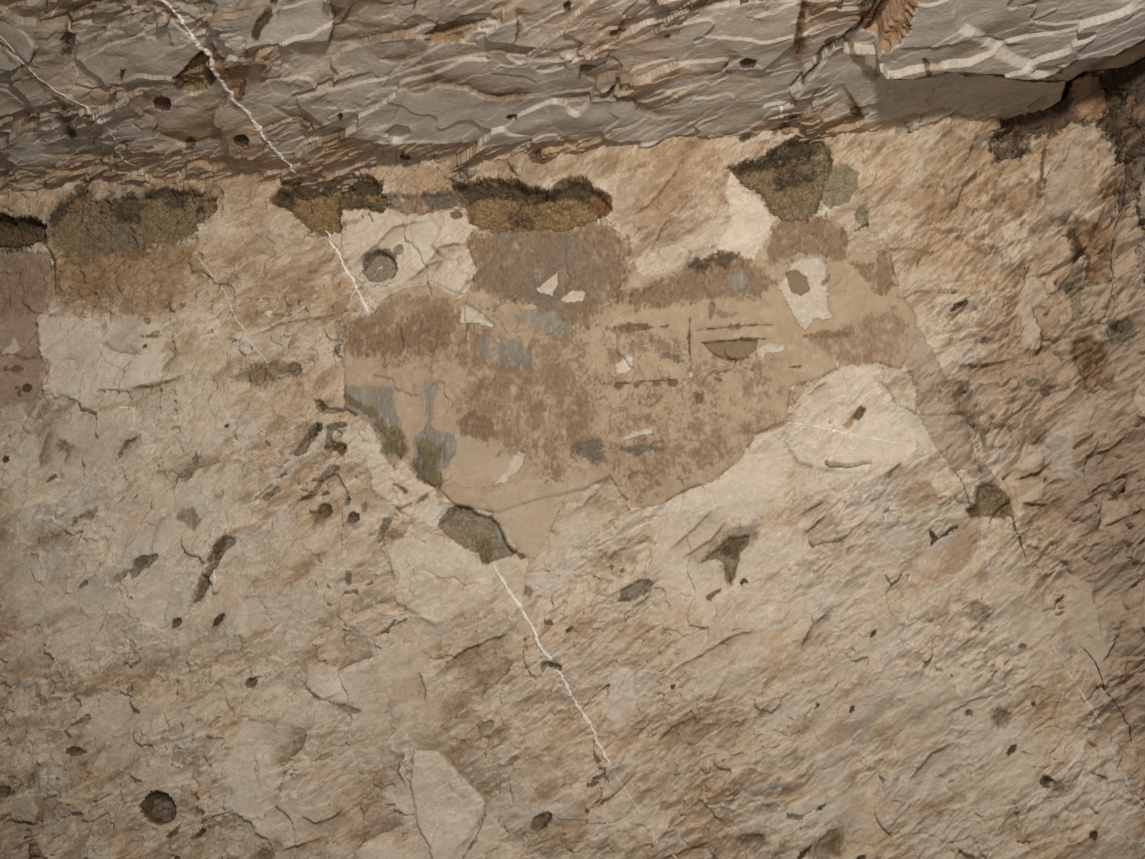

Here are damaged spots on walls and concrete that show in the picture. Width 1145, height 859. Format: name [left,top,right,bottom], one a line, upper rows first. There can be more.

water stain [466,174,896,338]
water stain [344,382,456,487]
water stain [571,437,604,463]
water stain [478,523,505,564]
crack [307,689,359,713]